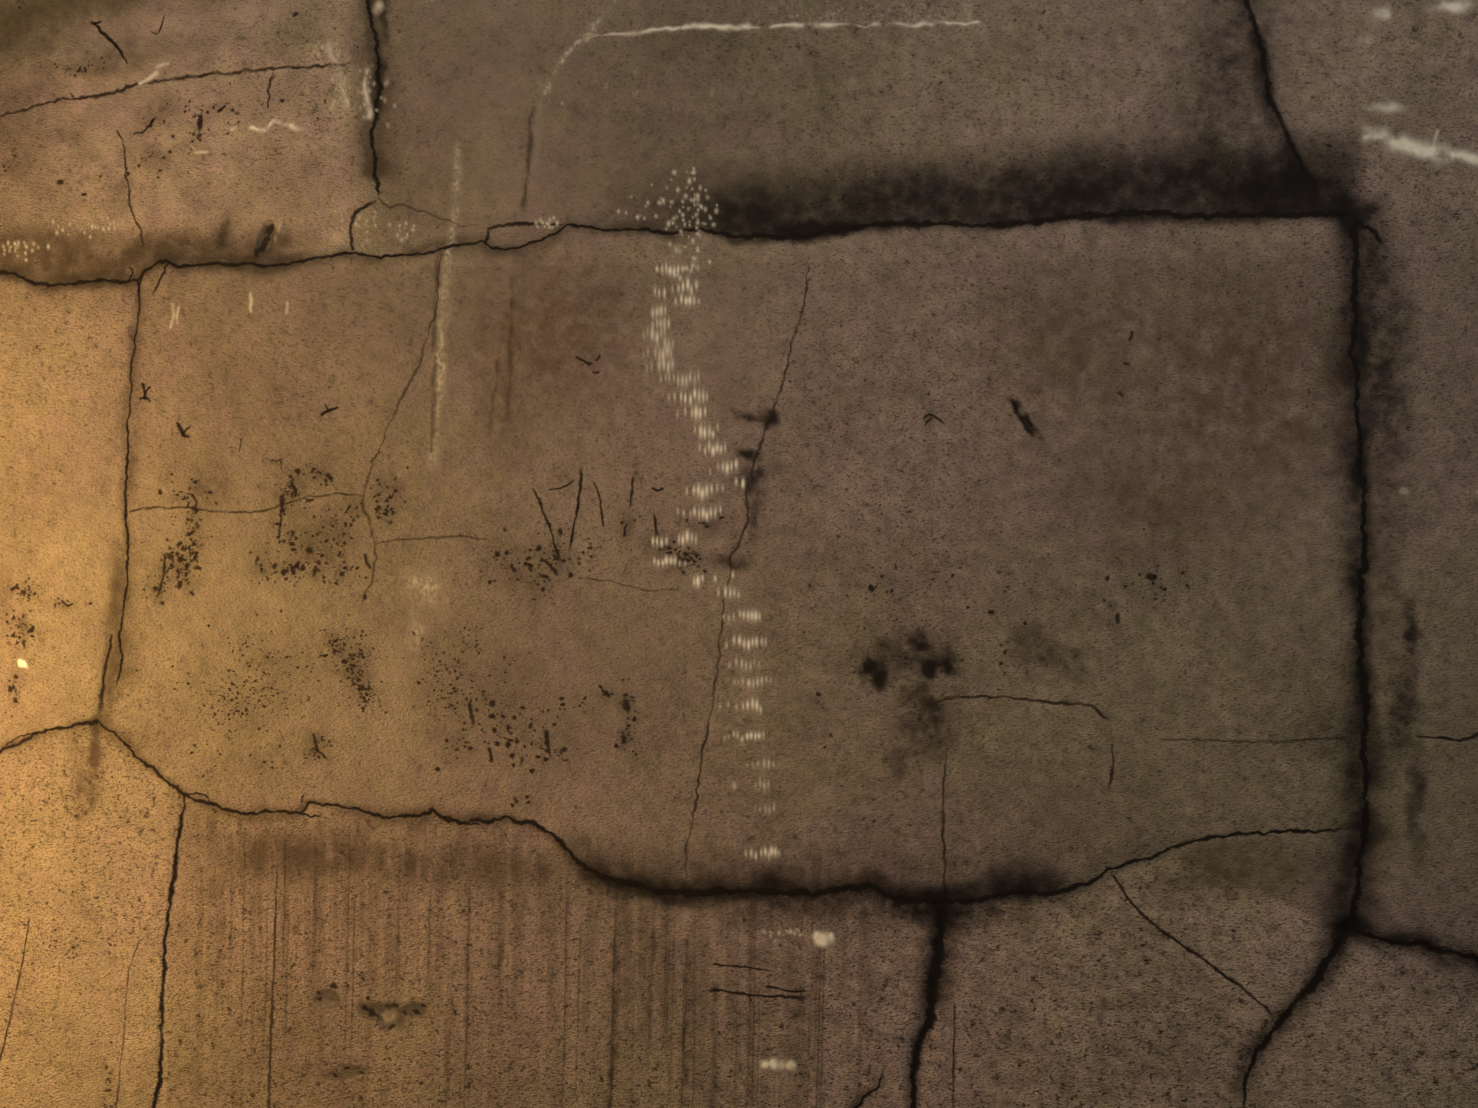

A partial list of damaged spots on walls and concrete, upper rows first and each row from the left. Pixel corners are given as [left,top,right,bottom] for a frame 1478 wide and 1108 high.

damp [1364,131,1478,165]
crack [0,0,1342,707]
damp [651,265,763,492]
damp [648,486,760,620]
crack [692,268,810,816]
damp [733,637,766,711]
damp [852,659,887,689]
crack [927,695,1114,785]
crack [1243,219,1478,1106]
crack [0,720,1337,1108]
damp [787,930,834,947]
damp [761,1059,796,1070]